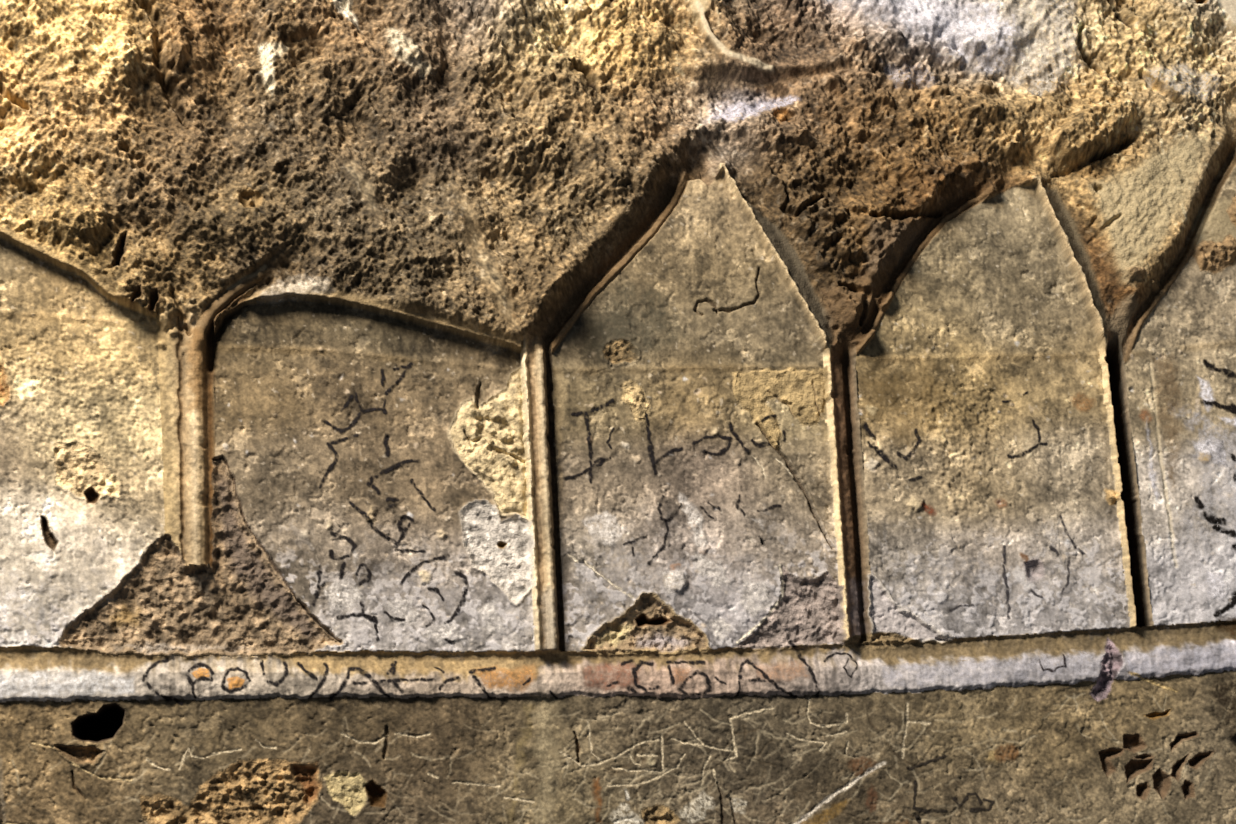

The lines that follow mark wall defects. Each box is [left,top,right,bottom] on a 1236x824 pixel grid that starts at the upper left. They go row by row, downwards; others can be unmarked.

flaking render [198,9,332,78]
damp [839,0,1077,94]
flaking render [668,69,810,136]
damp [720,98,795,121]
damp [1147,65,1218,98]
spalling [235,186,266,210]
spalling [110,229,131,269]
spalling [128,281,162,320]
flaking render [447,361,537,606]
flaking render [55,454,346,659]
flaking render [582,593,711,655]
flaking render [138,757,390,824]